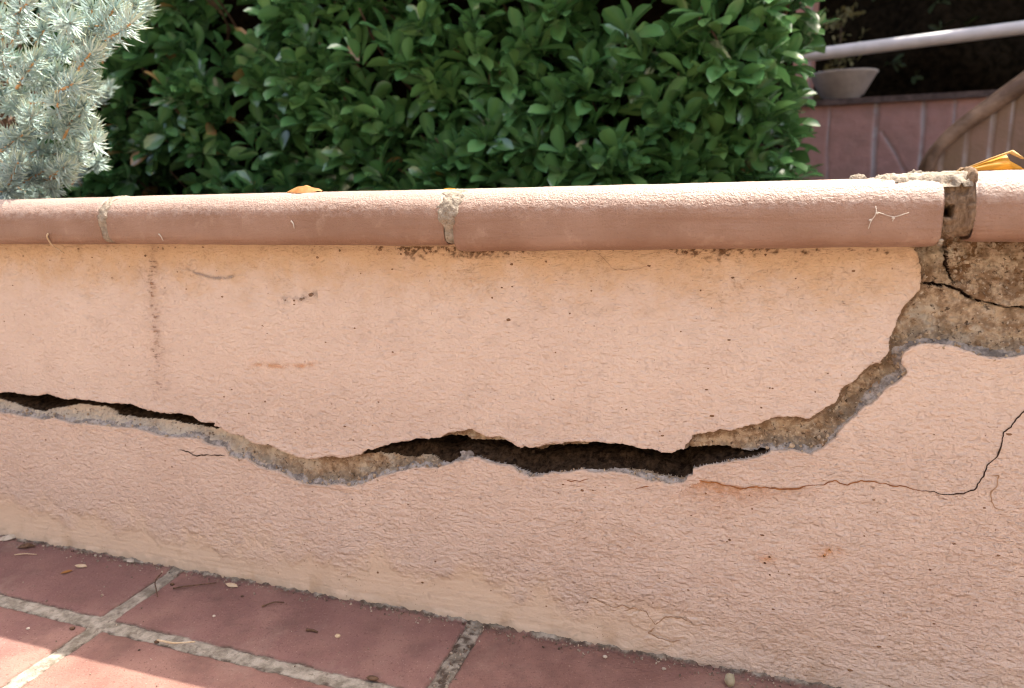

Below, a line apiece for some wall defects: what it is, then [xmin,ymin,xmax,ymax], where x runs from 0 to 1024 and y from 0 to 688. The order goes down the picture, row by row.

spalling [684,236,1024,453]
crack [0,392,227,457]
crack [363,411,1024,512]